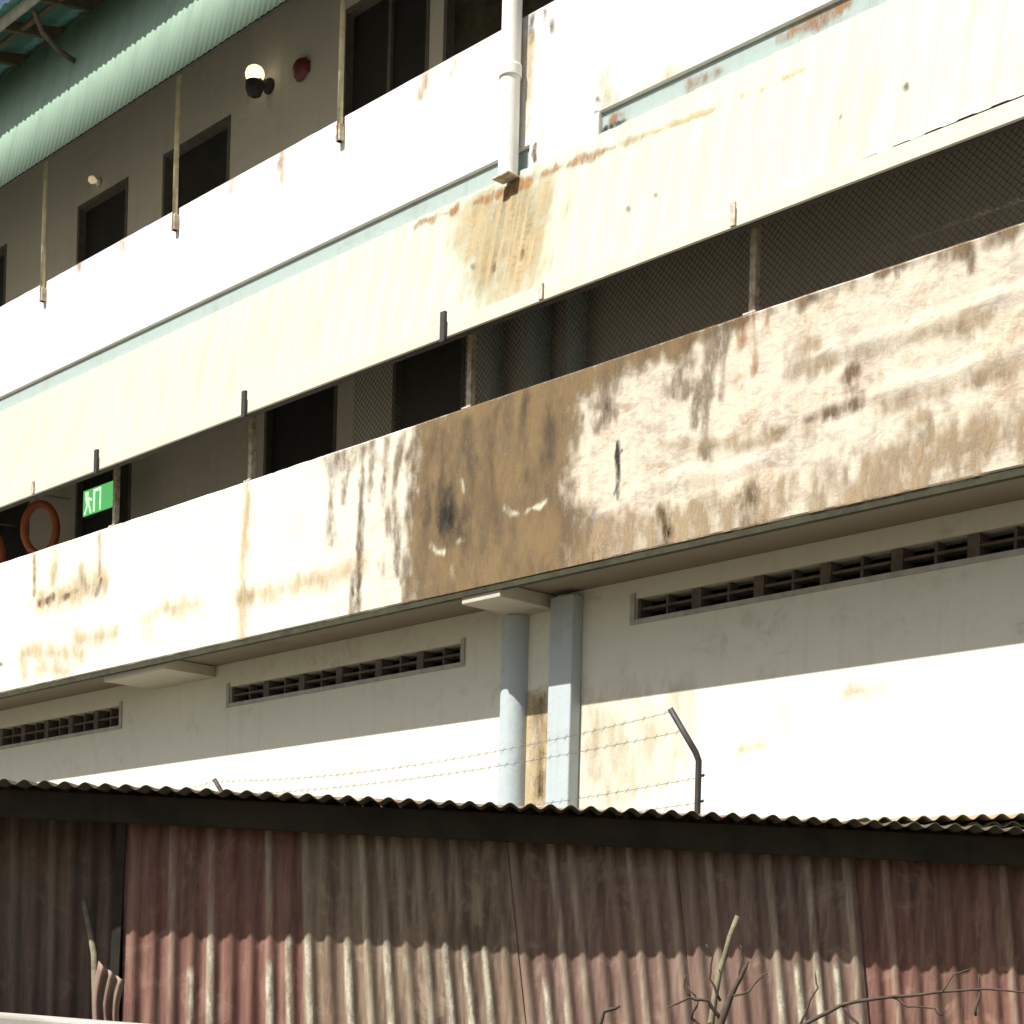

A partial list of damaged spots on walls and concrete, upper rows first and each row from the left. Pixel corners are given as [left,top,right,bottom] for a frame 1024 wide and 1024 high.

rust [787,0,850,37]
rust [670,108,713,126]
rust [450,148,605,302]
leakage [988,224,1019,245]
leakage [874,262,906,278]
leakage [952,240,974,271]
leakage [796,293,816,310]
leakage [341,314,794,614]
leakage [328,449,348,531]
leakage [37,562,107,607]
leakage [524,692,548,807]